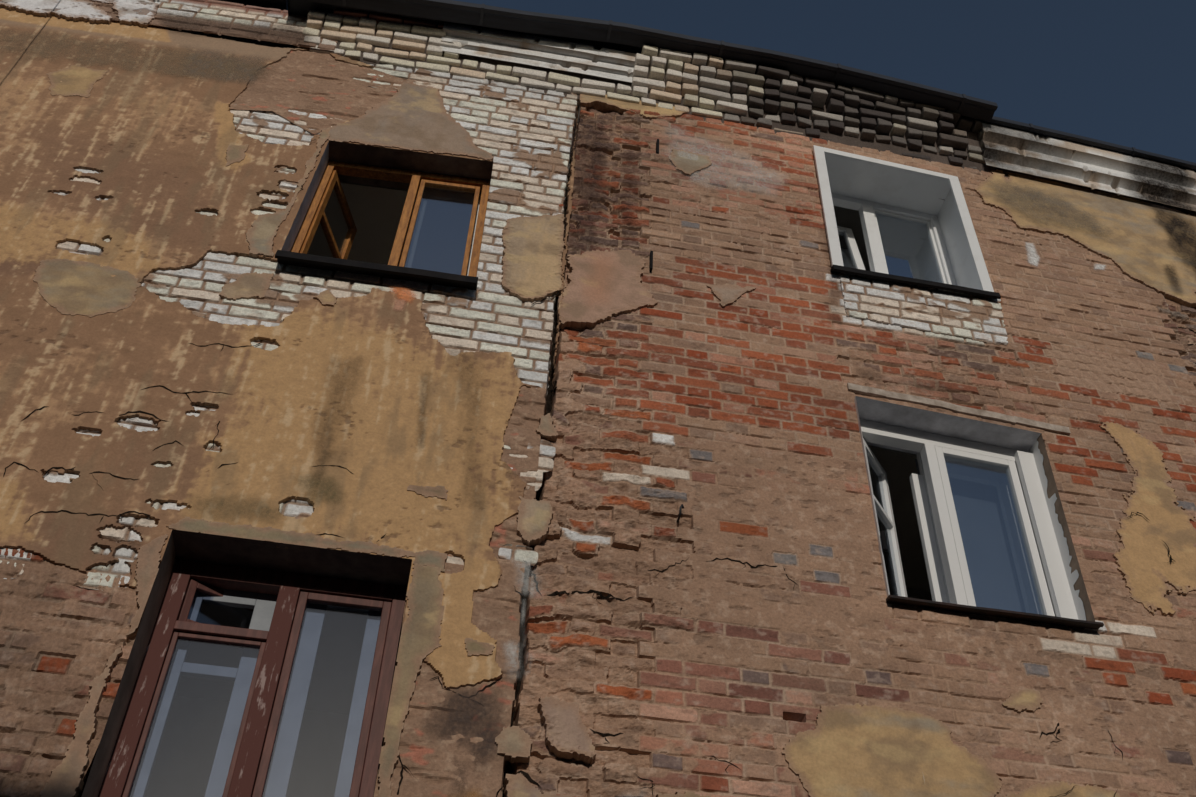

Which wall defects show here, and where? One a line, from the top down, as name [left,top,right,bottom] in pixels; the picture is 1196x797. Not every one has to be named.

peeling [0,0,159,28]
spalling [141,48,687,500]
crack [564,105,578,235]
peeling [973,169,1196,308]
water stain [1134,156,1196,269]
crack [531,291,560,415]
crack [3,462,150,523]
crack [20,385,238,468]
peeling [1097,421,1196,616]
spalling [0,501,189,797]
spalling [373,515,538,797]
crack [430,546,632,727]